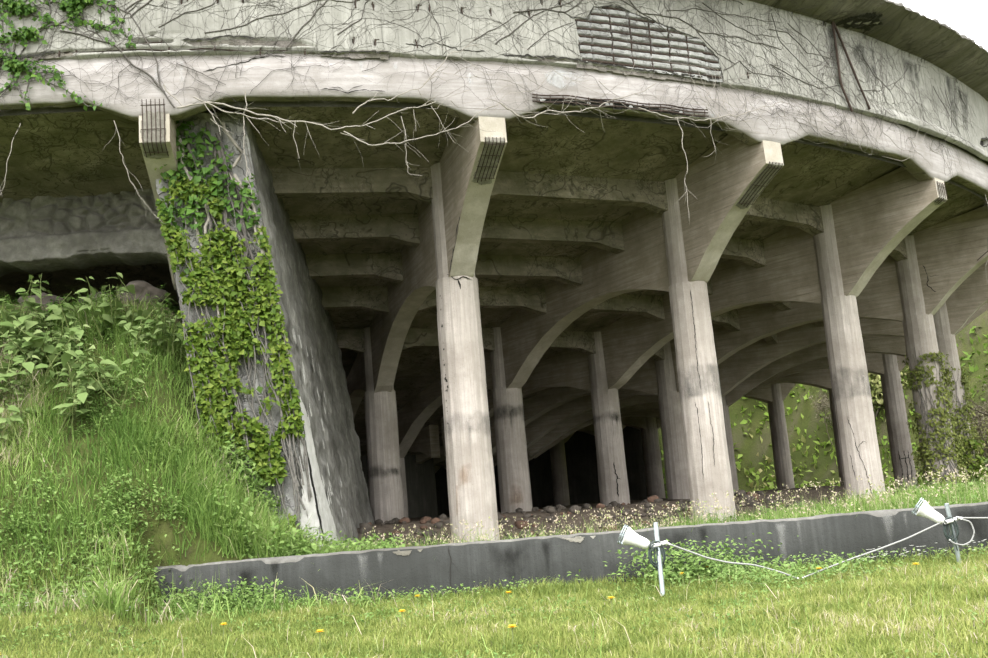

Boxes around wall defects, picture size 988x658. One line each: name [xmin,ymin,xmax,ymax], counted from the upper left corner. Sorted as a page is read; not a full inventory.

spalling [502,5,724,86]
spalling [140,99,169,159]
spalling [472,137,505,185]